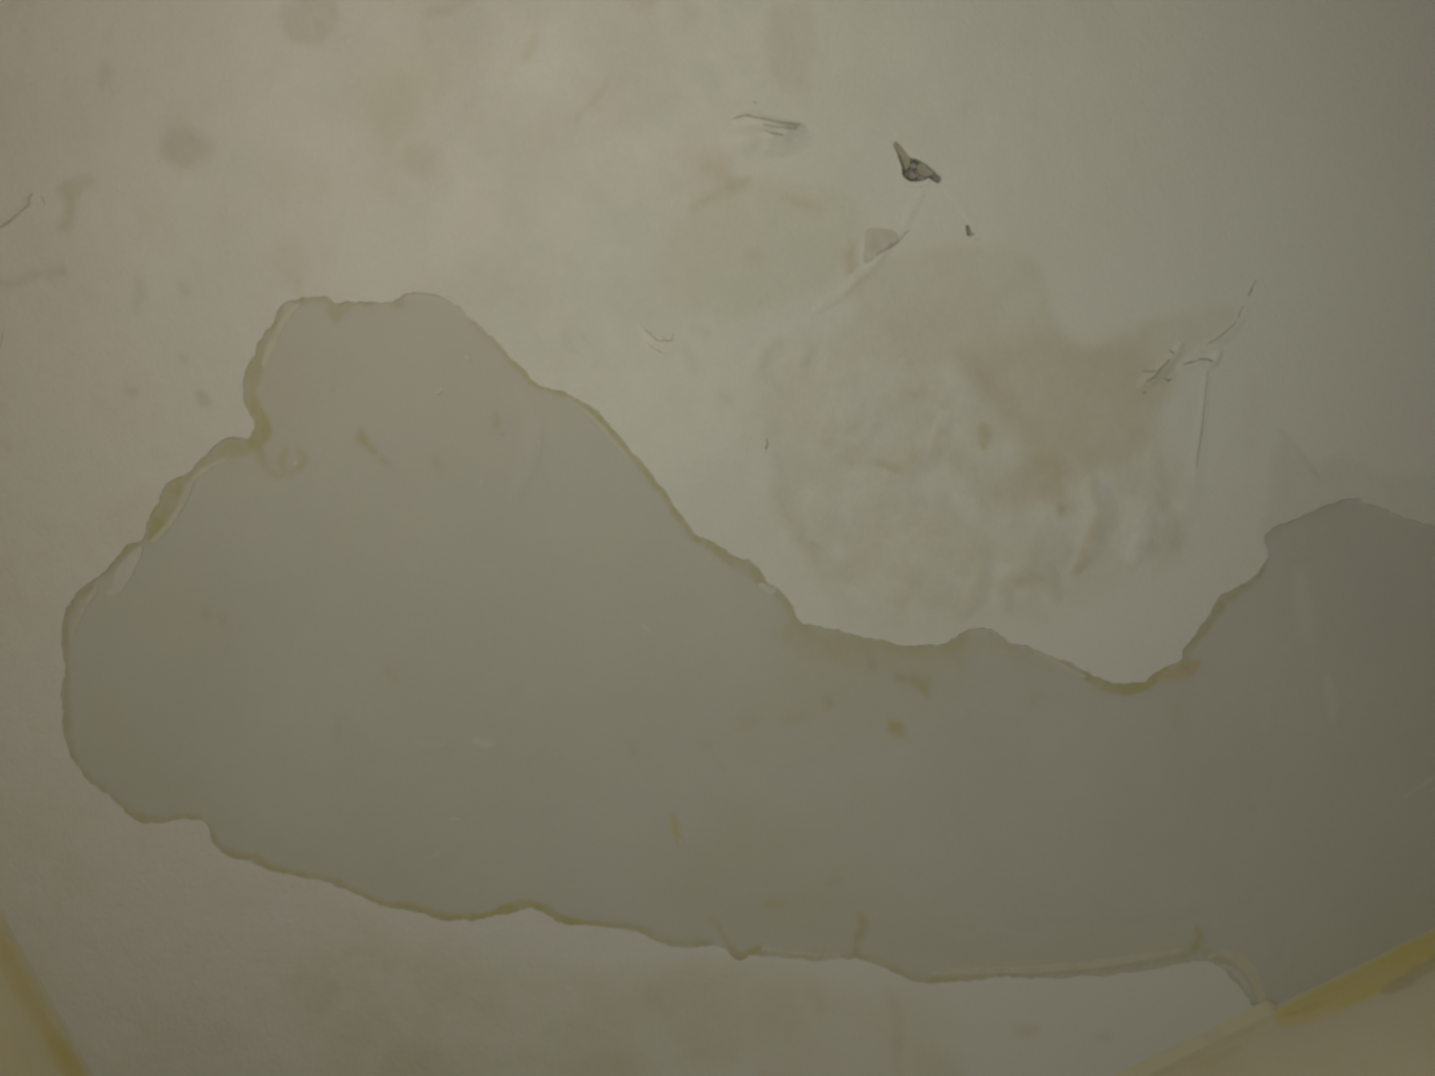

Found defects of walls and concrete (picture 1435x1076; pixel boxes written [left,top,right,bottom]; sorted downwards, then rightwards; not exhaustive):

peeling [62,293,1435,1006]
damp [641,136,1248,646]